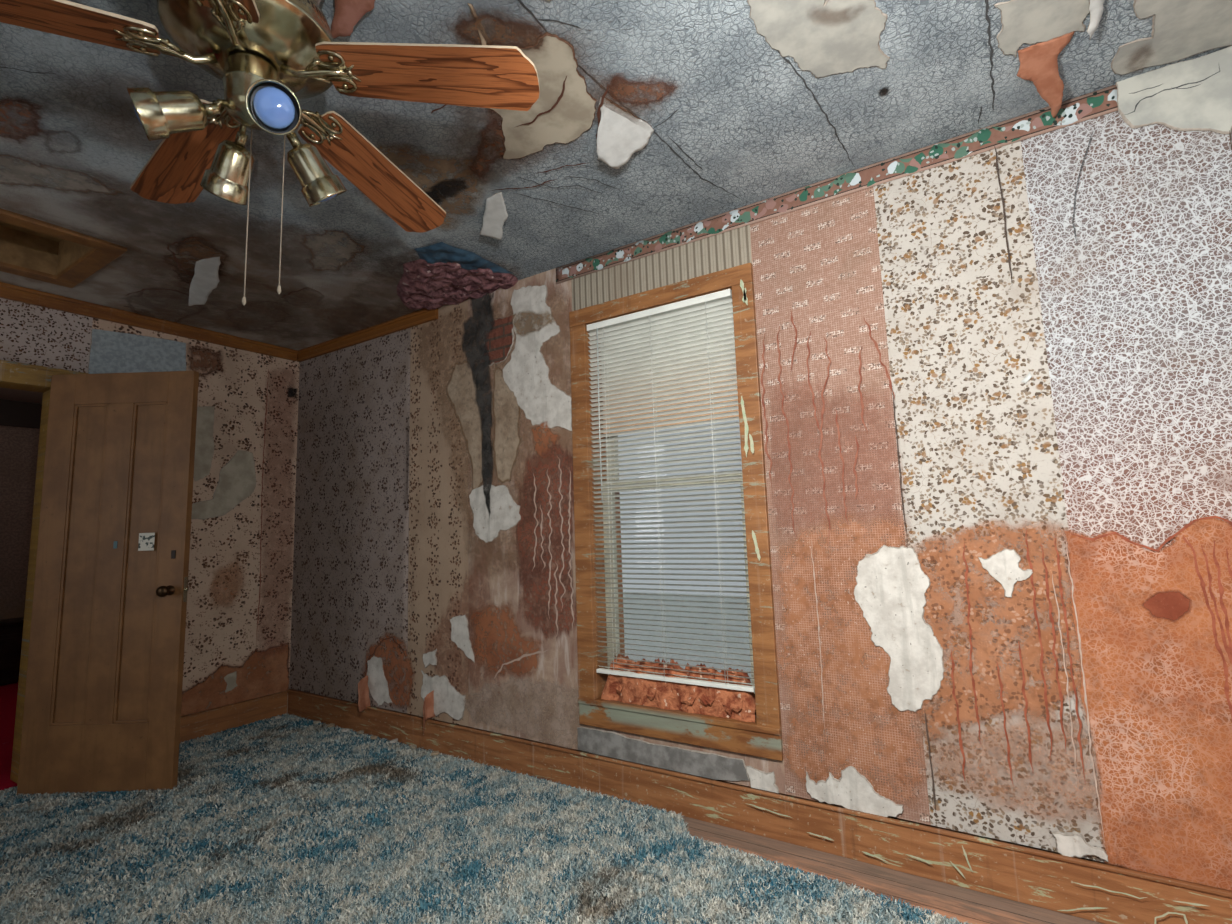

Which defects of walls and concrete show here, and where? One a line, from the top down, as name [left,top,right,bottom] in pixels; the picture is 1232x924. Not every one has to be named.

damp [0,98,125,196]
crack [518,0,581,32]
peeling [489,32,654,169]
crack [578,65,747,203]
crack [777,50,855,167]
crack [978,0,995,124]
peeling [1111,0,1232,134]
peeling [486,285,572,431]
damp [447,361,521,516]
peeling [854,545,945,712]
damp [951,544,982,780]
damp [1025,515,1232,842]